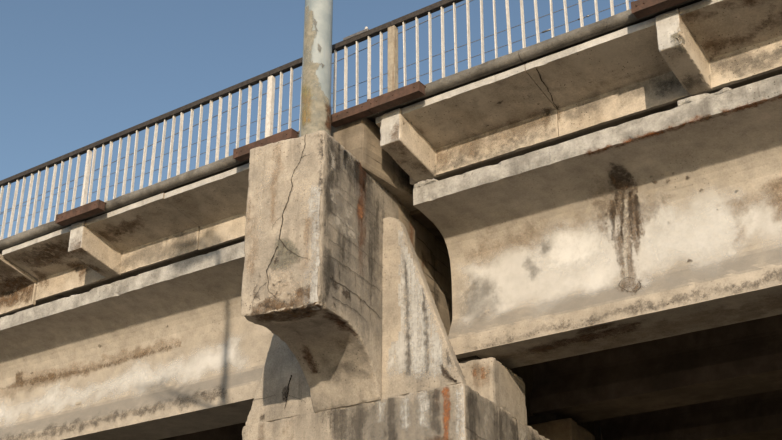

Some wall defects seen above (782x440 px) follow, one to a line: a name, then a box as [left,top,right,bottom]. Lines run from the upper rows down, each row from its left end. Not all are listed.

peeling [301,6,332,153]
rust [586,122,686,155]
rust [721,97,782,116]
crack [252,140,384,319]
water stain [306,140,372,310]
water stain [464,163,782,321]
water stain [387,230,448,377]
water stain [7,402,159,440]
water stain [0,339,244,422]
crack [253,375,306,420]
rust [435,387,450,440]